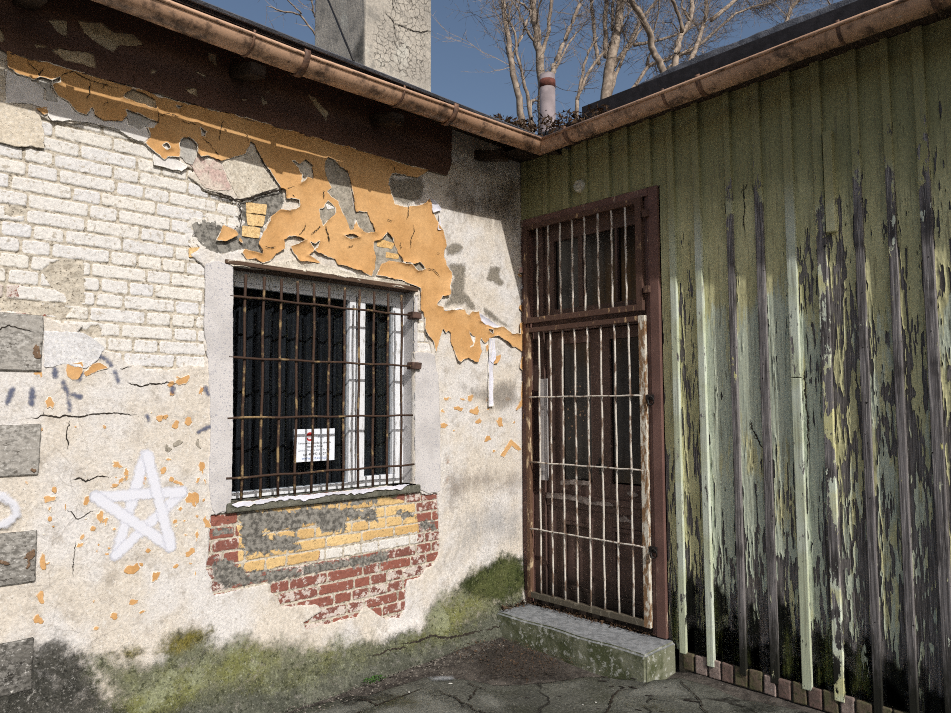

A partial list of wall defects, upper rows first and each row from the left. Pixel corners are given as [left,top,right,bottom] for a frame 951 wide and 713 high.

peeling [49,20,143,52]
crack [374,0,430,81]
spalling [0,29,524,431]
peeling [923,17,951,427]
peeling [660,31,937,709]
spalling [150,412,439,629]
damp [0,641,130,713]
damp [150,593,524,713]
crack [356,682,486,713]
crack [372,625,500,656]
crack [604,688,635,713]
damp [672,575,945,713]